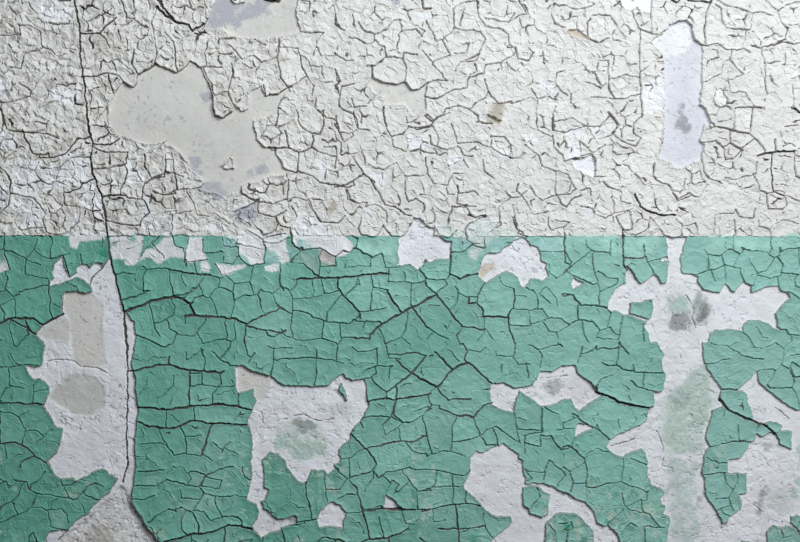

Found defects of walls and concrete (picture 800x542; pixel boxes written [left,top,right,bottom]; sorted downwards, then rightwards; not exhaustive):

crack [661,0,712,13]
peeling [0,0,800,324]
crack [757,142,800,202]
crack [0,0,334,485]
crack [634,194,687,225]
crack [296,271,518,436]
peeling [0,236,666,542]
peeling [324,236,800,542]
crack [587,380,653,446]
crack [712,395,790,446]
crack [157,515,258,542]
crack [334,497,485,542]